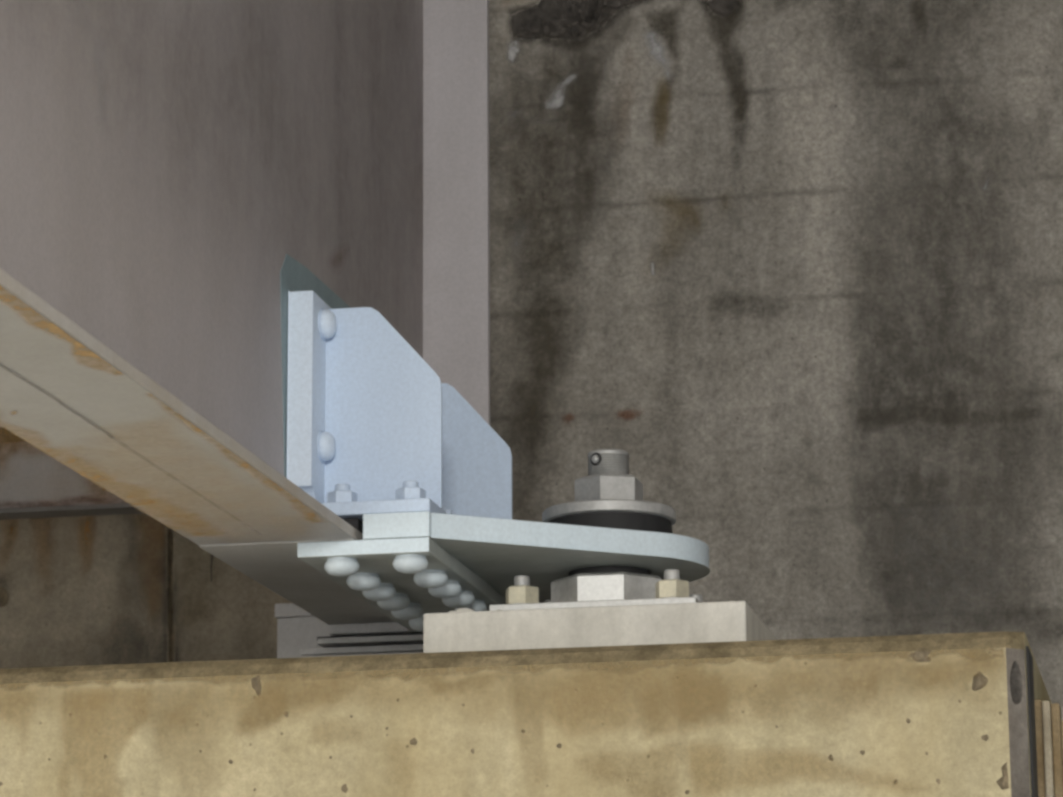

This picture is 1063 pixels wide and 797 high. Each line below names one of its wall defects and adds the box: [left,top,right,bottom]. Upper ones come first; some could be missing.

spalling [508,0,646,62]
damp [710,10,747,138]
damp [505,58,602,277]
corrosion [0,286,123,374]
damp [511,288,564,459]
damp [42,651,912,685]